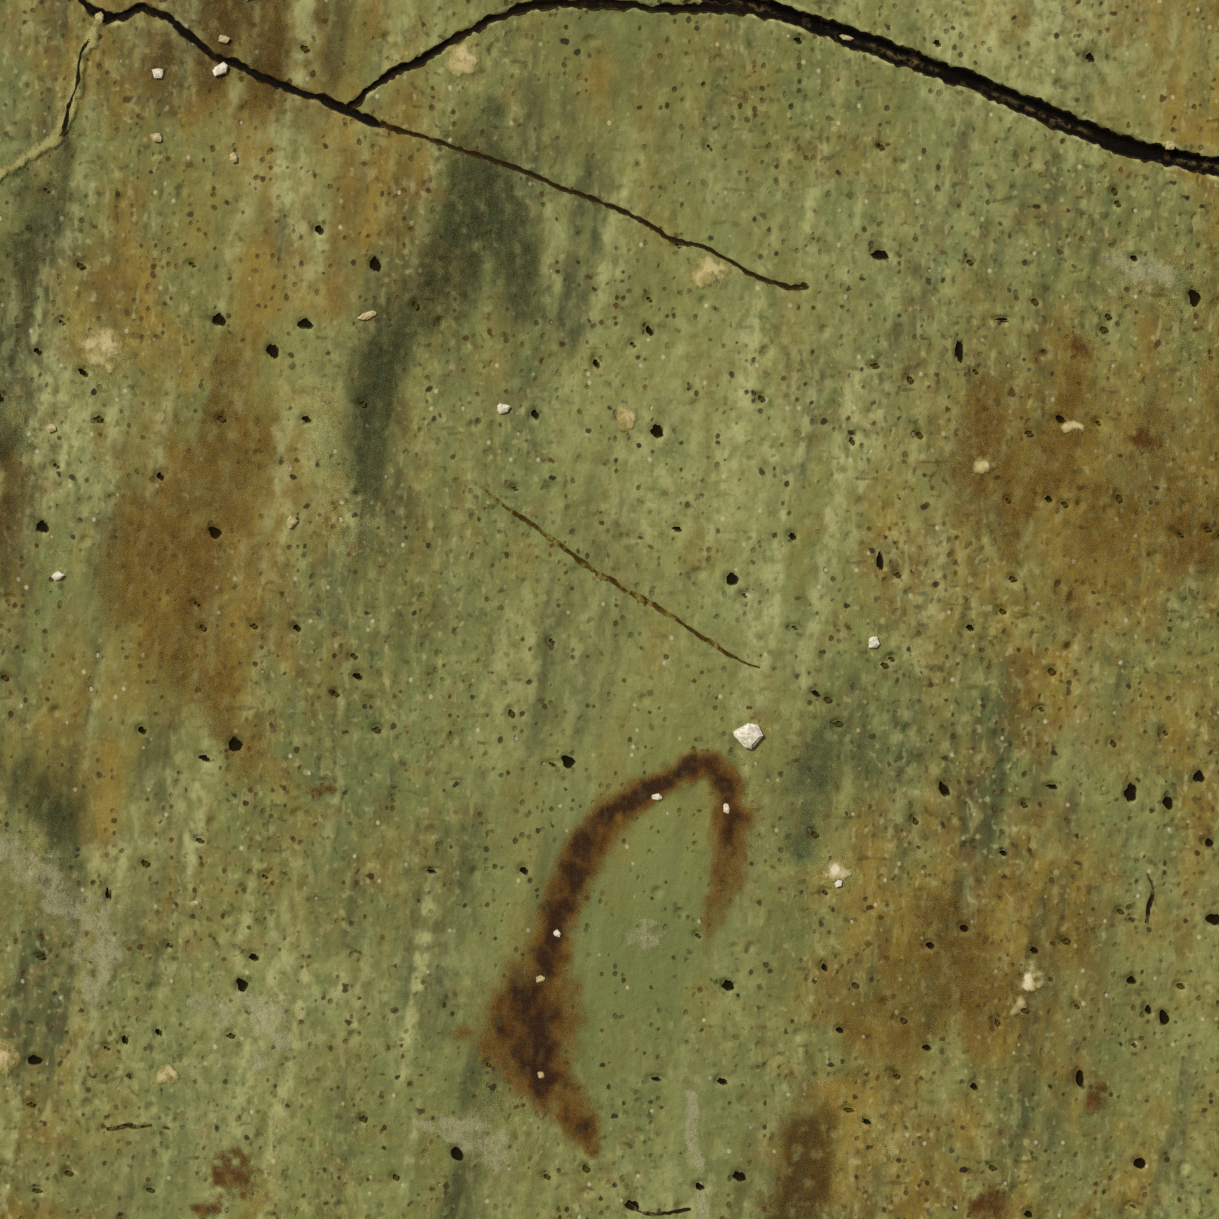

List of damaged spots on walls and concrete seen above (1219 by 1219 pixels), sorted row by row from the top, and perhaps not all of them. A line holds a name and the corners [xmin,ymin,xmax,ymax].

crack [0,0,1219,289]
crack [480,485,760,668]
rust [482,750,750,1156]